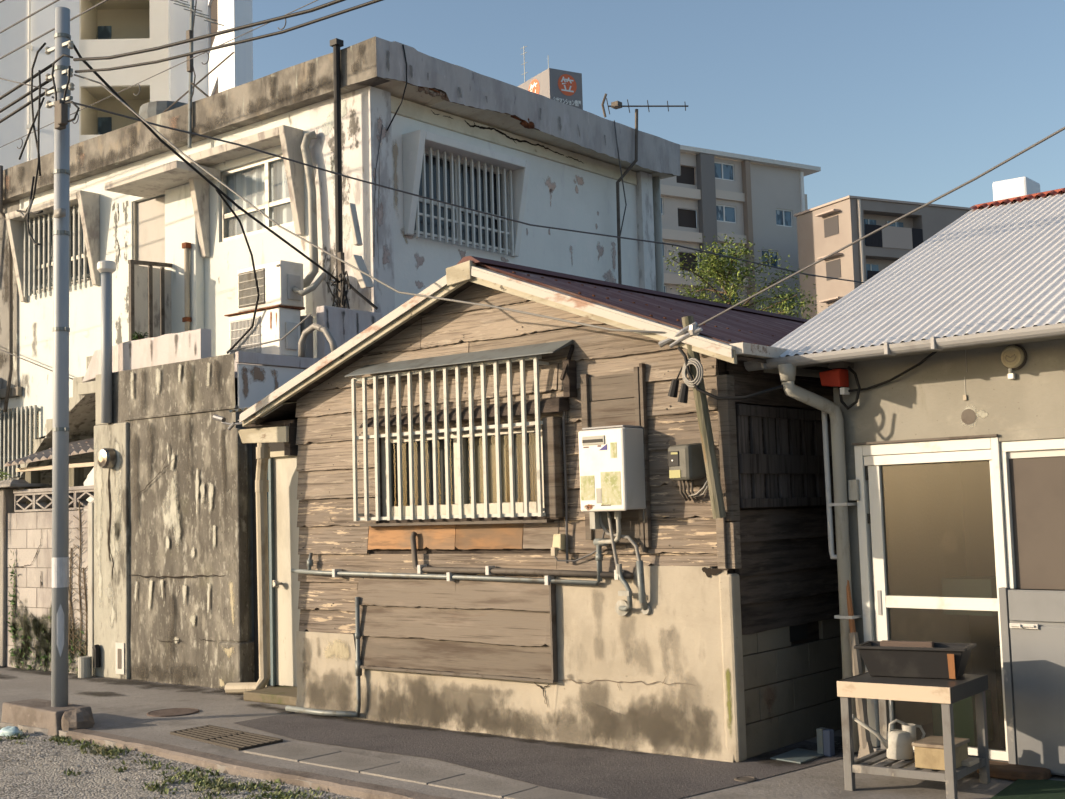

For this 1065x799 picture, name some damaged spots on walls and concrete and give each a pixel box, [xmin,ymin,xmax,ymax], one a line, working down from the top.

damp [70,63,334,174]
damp [329,109,360,204]
spalling [418,86,448,101]
crack [431,110,584,164]
spalling [511,115,535,129]
damp [319,245,359,333]
peeling [242,366,278,397]
damp [307,675,349,719]
damp [361,680,706,757]
crack [534,678,696,707]